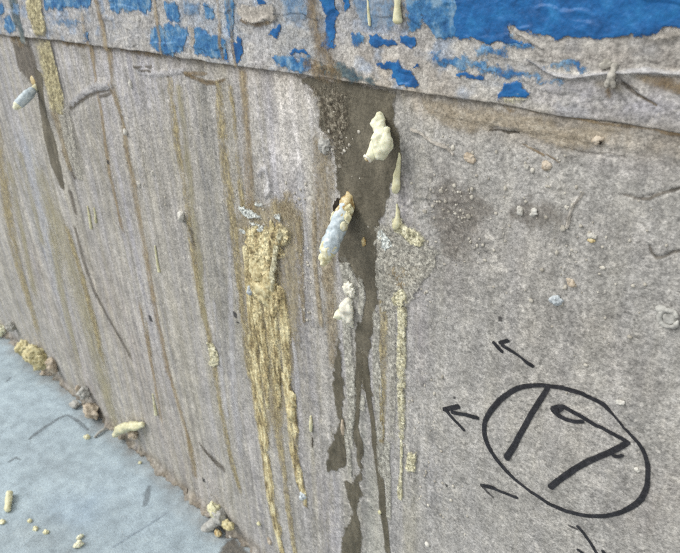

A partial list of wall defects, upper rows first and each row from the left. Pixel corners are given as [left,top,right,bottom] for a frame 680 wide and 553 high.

peeling [0,3,19,34]
peeling [44,0,91,11]
peeling [108,0,151,14]
peeling [150,0,307,63]
peeling [272,48,374,85]
peeling [319,0,680,147]
damp [10,36,76,189]
damp [0,147,38,327]
damp [273,76,401,553]